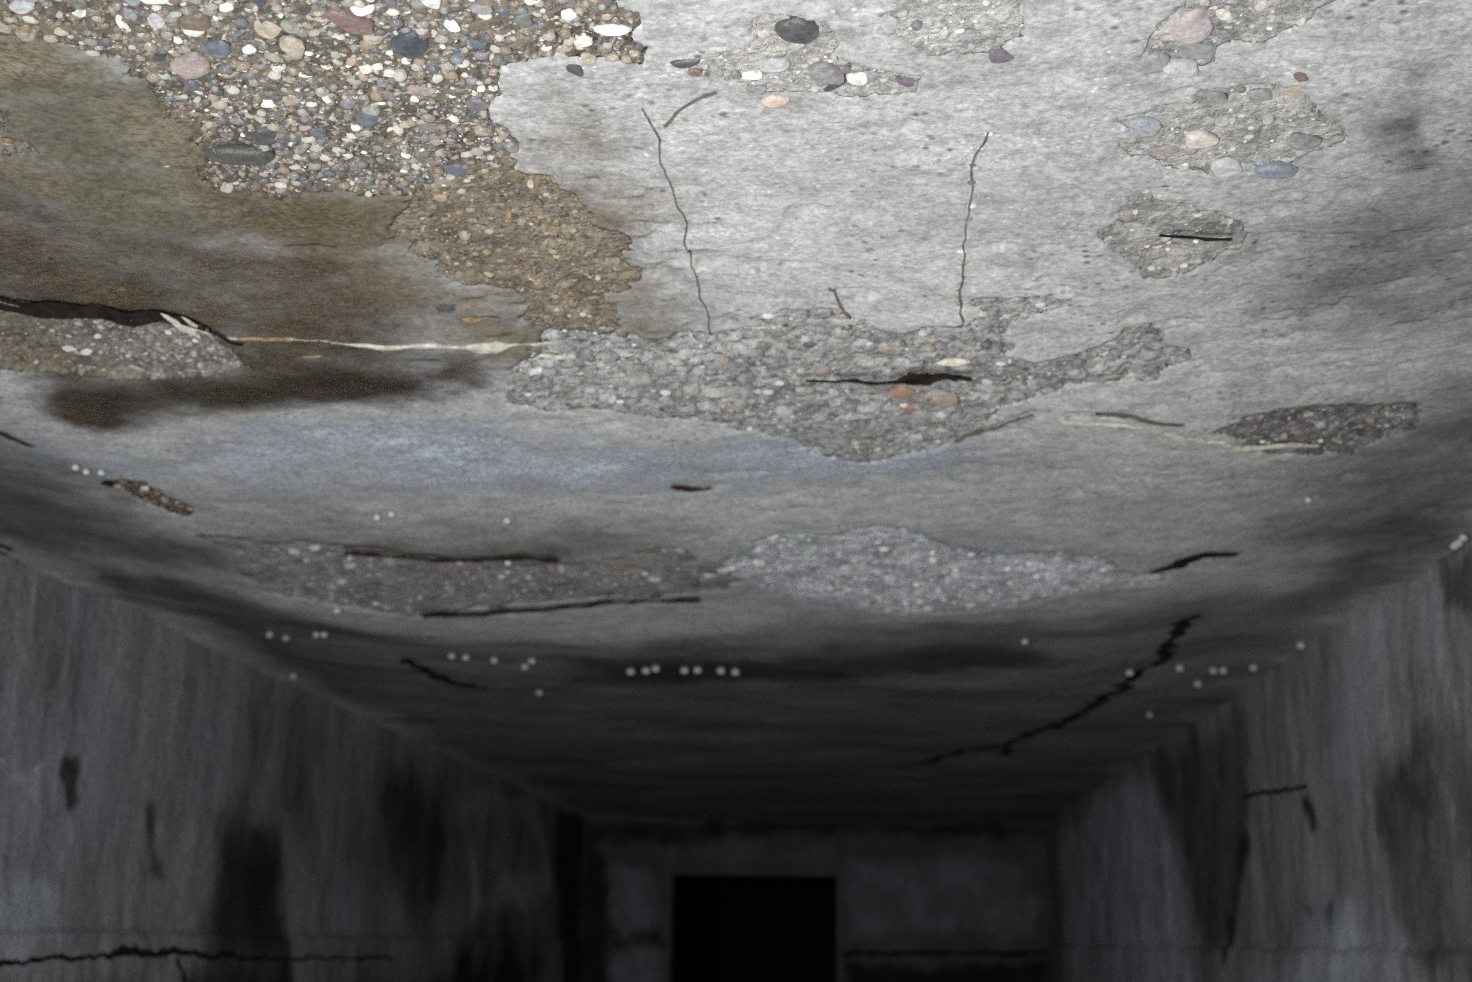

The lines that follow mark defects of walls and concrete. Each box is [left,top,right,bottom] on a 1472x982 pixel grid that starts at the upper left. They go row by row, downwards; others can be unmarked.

damp [0,35,576,430]
spalling [0,0,1192,462]
crack [641,92,717,335]
crack [955,132,993,328]
spalling [1098,193,1248,279]
crack [0,297,244,346]
spalling [113,478,195,517]
spalling [198,525,1170,618]
damp [60,758,79,810]
damp [98,574,1314,982]
damp [1303,797,1316,830]
crack [0,945,394,982]